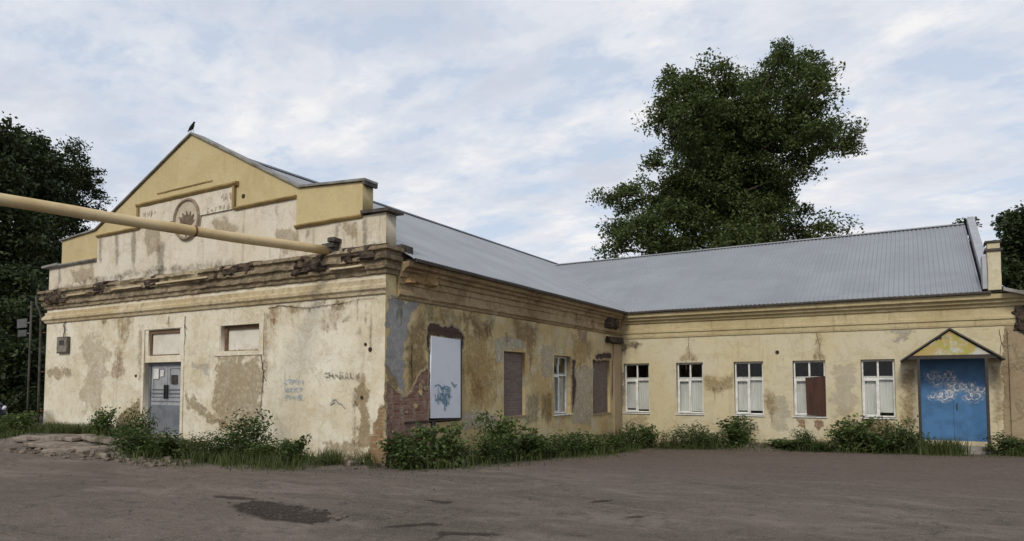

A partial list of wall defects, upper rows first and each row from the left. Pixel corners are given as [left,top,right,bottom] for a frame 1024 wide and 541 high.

spalling [424,321,465,352]
peeling [185,349,265,434]
spalling [323,295,430,466]
peeling [768,396,824,430]